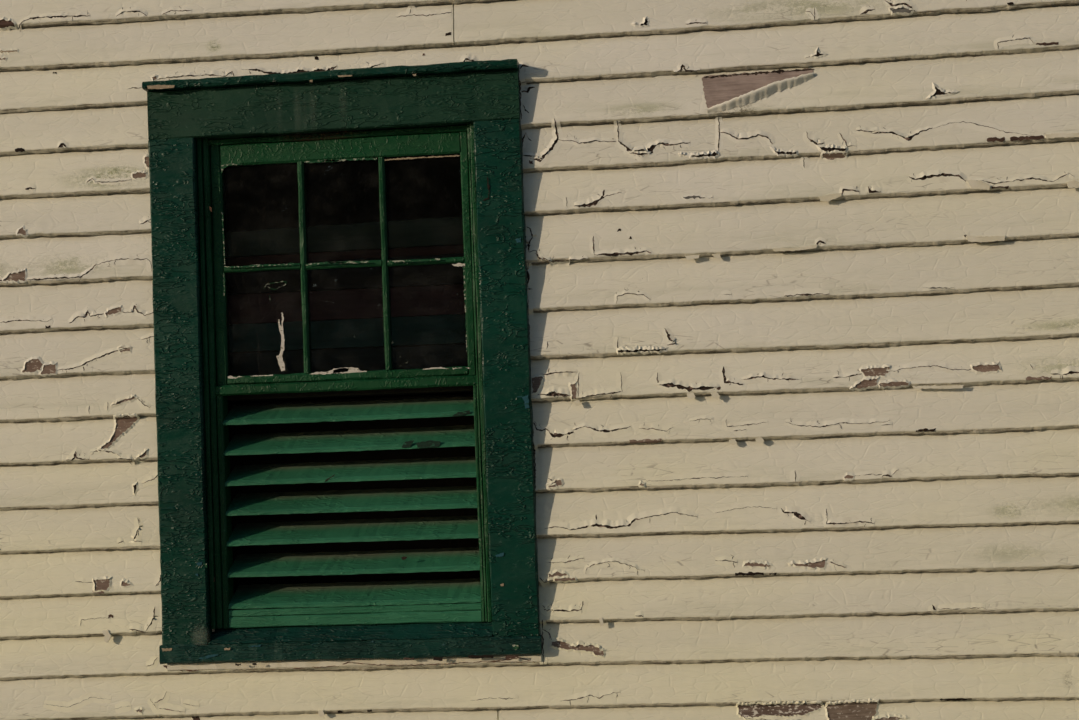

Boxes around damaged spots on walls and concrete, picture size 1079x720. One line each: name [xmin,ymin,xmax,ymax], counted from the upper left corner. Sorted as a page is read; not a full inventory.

peeling [802,131,857,162]
peeling [987,133,1079,142]
peeling [21,333,154,377]
peeling [519,367,581,409]
crack [719,366,802,388]
crack [833,370,862,383]
peeling [849,360,1003,392]
peeling [90,394,151,465]
crack [533,372,890,491]
crack [234,470,875,671]
crack [560,688,621,705]
peeling [736,698,910,720]